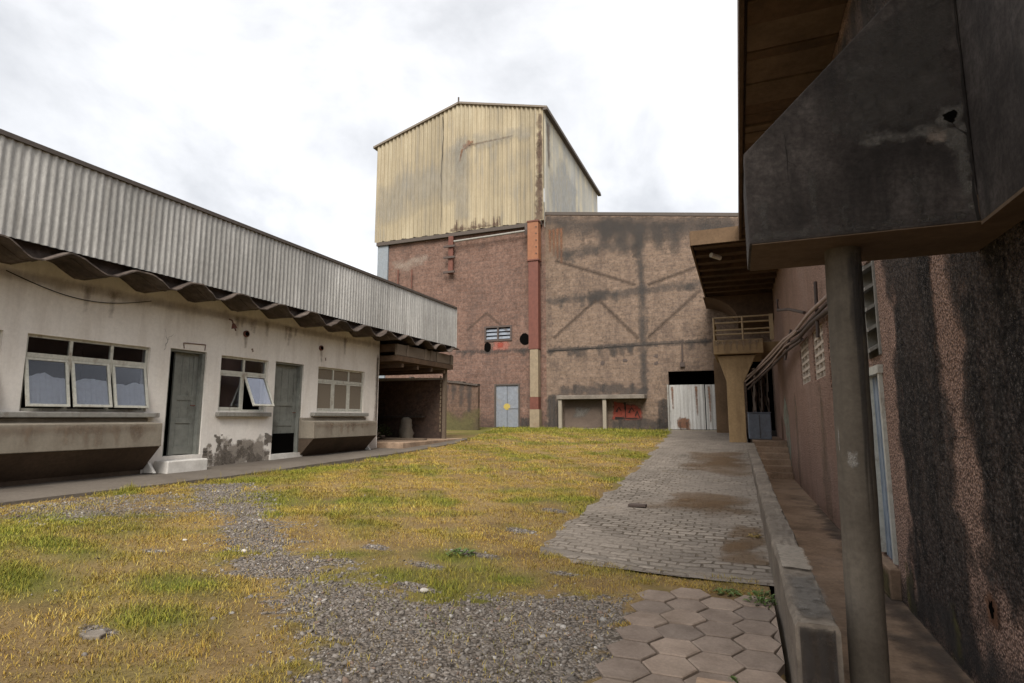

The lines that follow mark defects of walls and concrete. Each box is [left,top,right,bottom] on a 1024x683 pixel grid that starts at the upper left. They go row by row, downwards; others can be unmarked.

leakage [830,0,975,222]
leakage [549,216,732,236]
peeling [202,433,272,466]
leakage [881,220,1024,683]